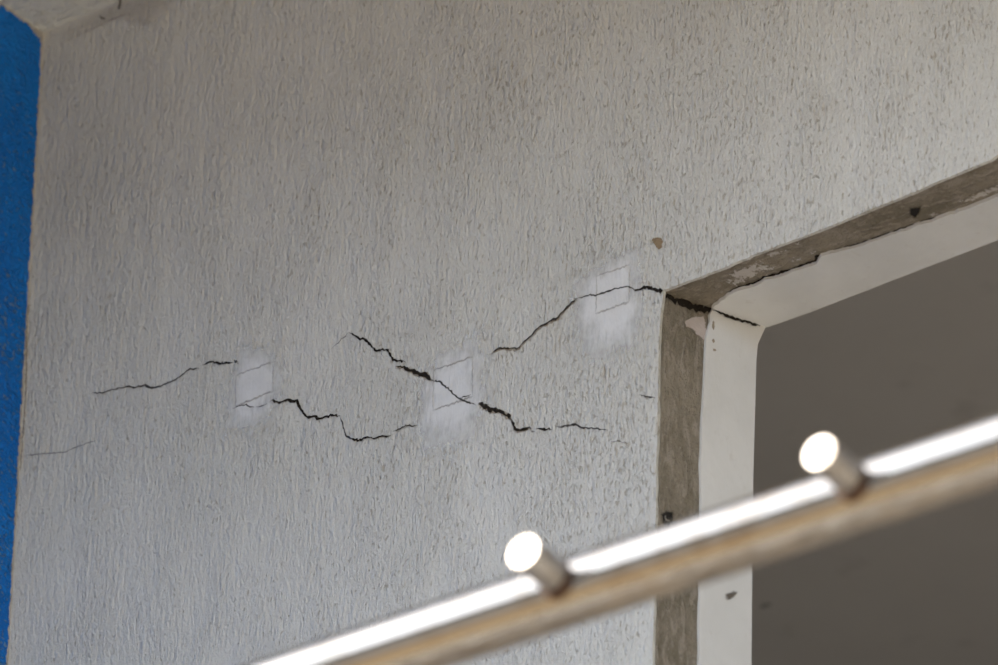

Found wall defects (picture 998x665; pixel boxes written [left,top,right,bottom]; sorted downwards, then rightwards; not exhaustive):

crack [94,360,238,394]
crack [335,332,624,443]
crack [235,398,416,442]